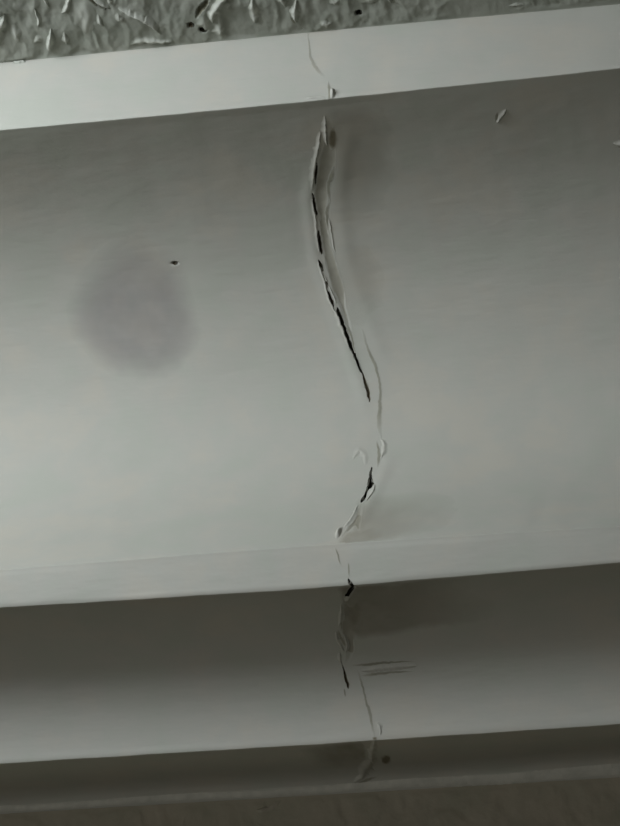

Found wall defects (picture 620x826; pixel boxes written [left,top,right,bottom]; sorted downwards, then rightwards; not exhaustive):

peeling [0,9,22,43]
peeling [33,8,70,52]
peeling [61,0,173,45]
peeling [189,0,228,37]
peeling [248,0,262,23]
peeling [277,0,305,32]
crack [307,33,391,784]